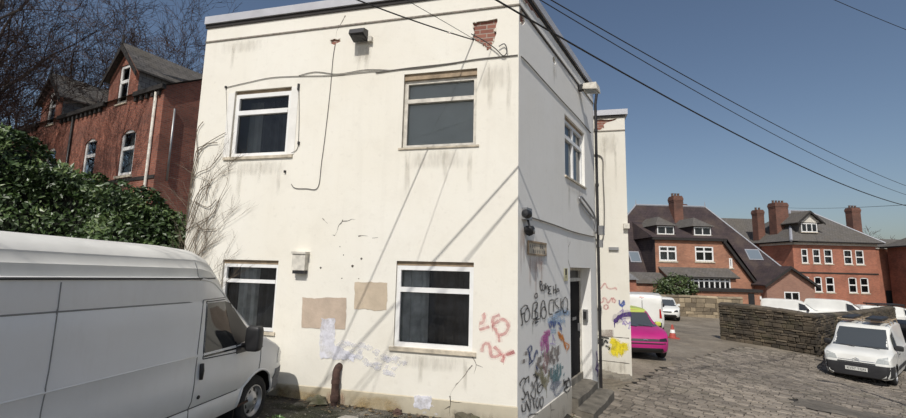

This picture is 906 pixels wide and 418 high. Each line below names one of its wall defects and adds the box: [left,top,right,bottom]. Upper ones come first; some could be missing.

spalling [473,20,498,50]
spalling [597,118,616,130]
crack [446,357,481,413]